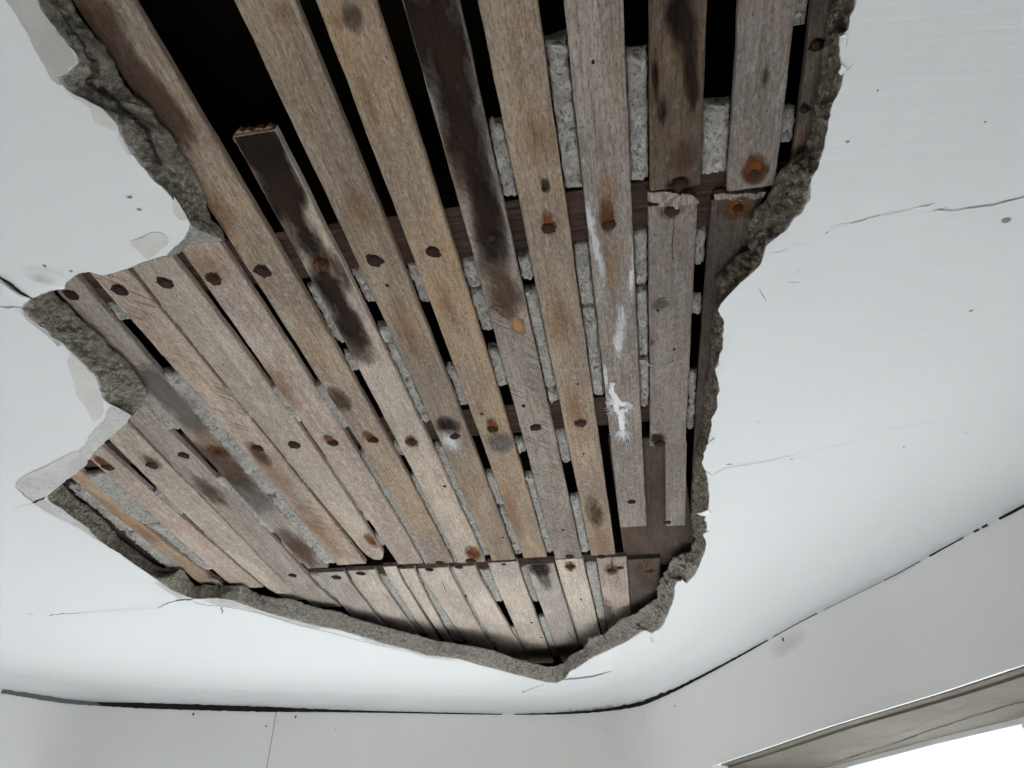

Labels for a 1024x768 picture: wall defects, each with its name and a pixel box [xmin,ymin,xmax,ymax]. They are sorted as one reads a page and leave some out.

leakage [666,0,699,109]
leakage [652,61,666,123]
leakage [403,0,522,316]
corrosion [743,156,768,182]
leakage [234,131,372,363]
corrosion [599,203,614,231]
crack [773,196,1024,255]
crack [0,267,66,308]
spalling [5,0,856,683]
leakage [603,380,635,445]
corrosion [466,547,481,561]
crack [1,504,1024,768]